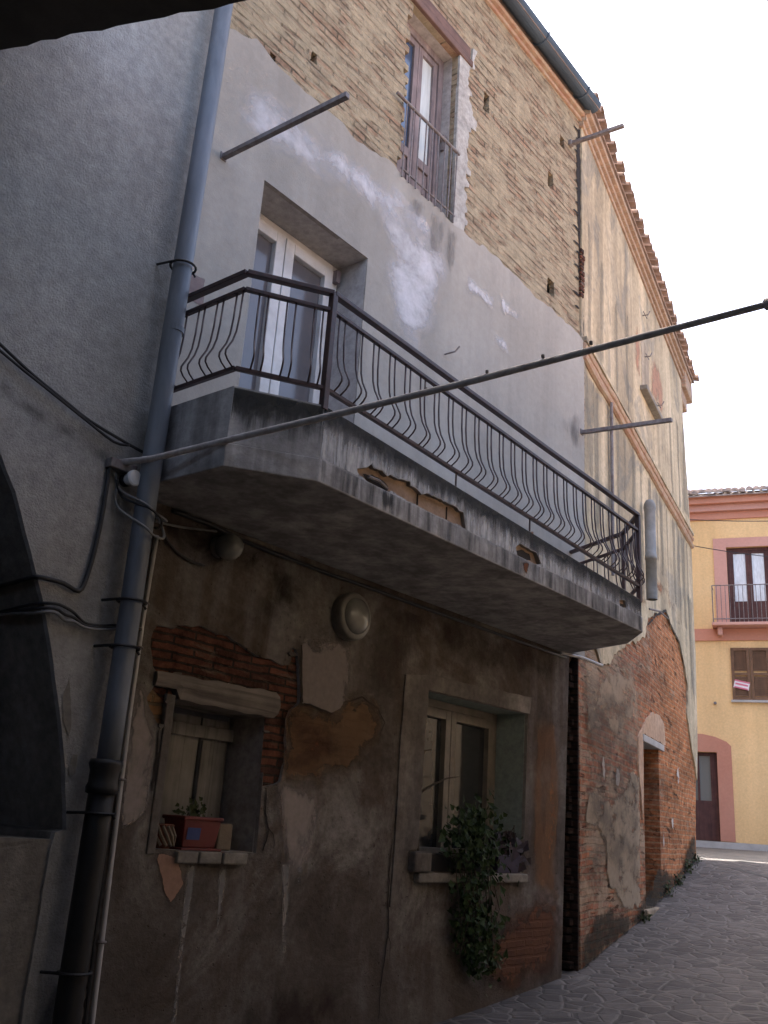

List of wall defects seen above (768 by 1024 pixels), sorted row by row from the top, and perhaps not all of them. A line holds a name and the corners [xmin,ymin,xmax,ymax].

leakage [252,101,442,328]
spalling [357,467,462,527]
spalling [516,545,543,573]
spalling [147,626,298,786]